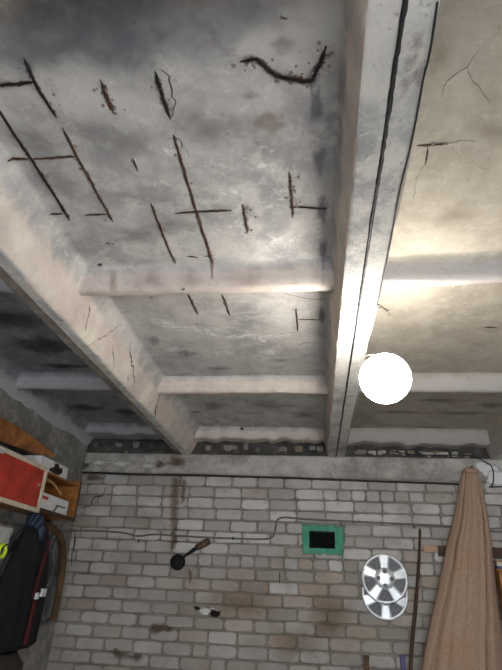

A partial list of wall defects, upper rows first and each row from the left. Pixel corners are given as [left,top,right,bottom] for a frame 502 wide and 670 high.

crack [442,50,489,102]
crack [112,343,135,385]
rust [172,479,185,549]